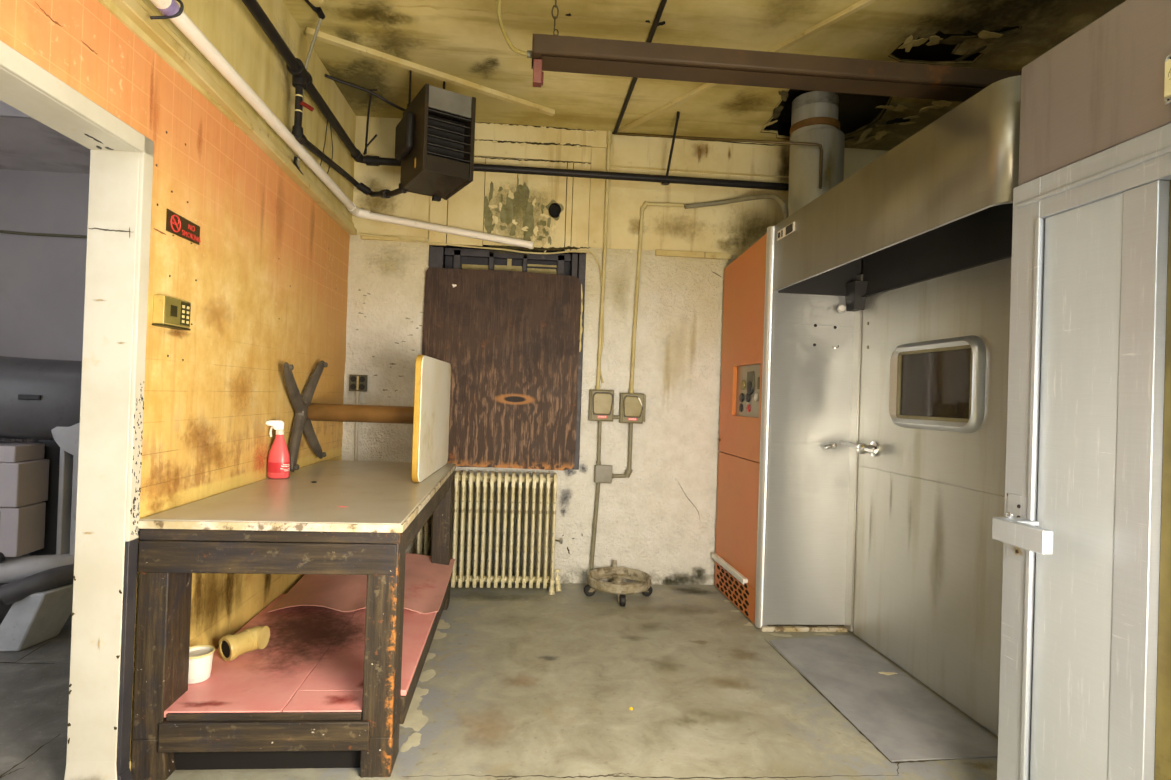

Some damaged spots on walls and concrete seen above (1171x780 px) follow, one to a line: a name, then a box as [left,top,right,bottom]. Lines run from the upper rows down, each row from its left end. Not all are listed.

peeling [898,35,943,52]
peeling [978,30,1003,39]
peeling [475,122,596,148]
peeling [845,100,952,145]
peeling [474,156,590,253]
water stain [664,569,706,594]
crack [404,763,899,780]